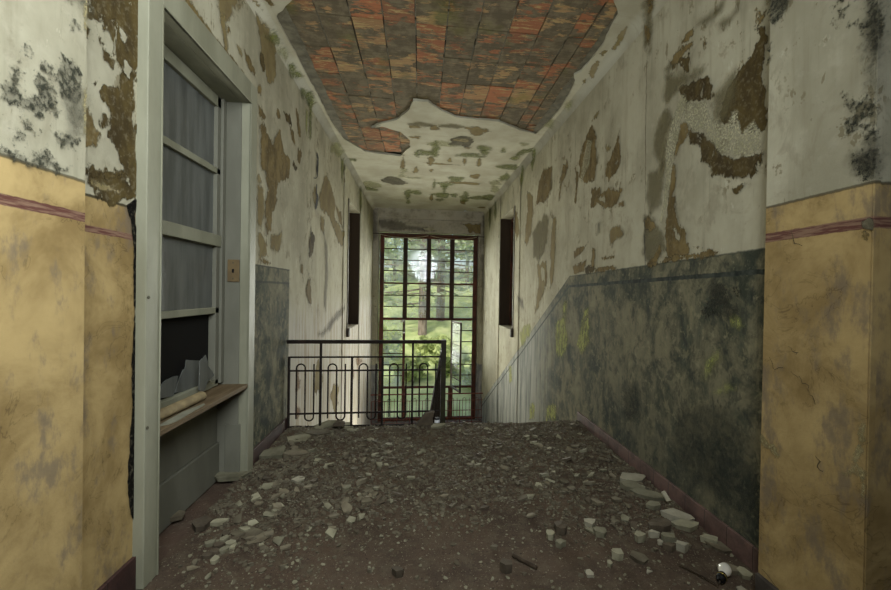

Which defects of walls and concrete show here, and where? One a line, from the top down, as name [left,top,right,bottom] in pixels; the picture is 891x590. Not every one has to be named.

damp [0,43,83,176]
peeling [83,0,138,519]
peeling [185,0,262,95]
peeling [257,106,302,265]
spalling [244,0,627,153]
peeling [513,111,624,312]
peeling [648,122,763,267]
peeling [664,7,768,134]
damp [834,0,885,50]
damp [840,91,881,181]